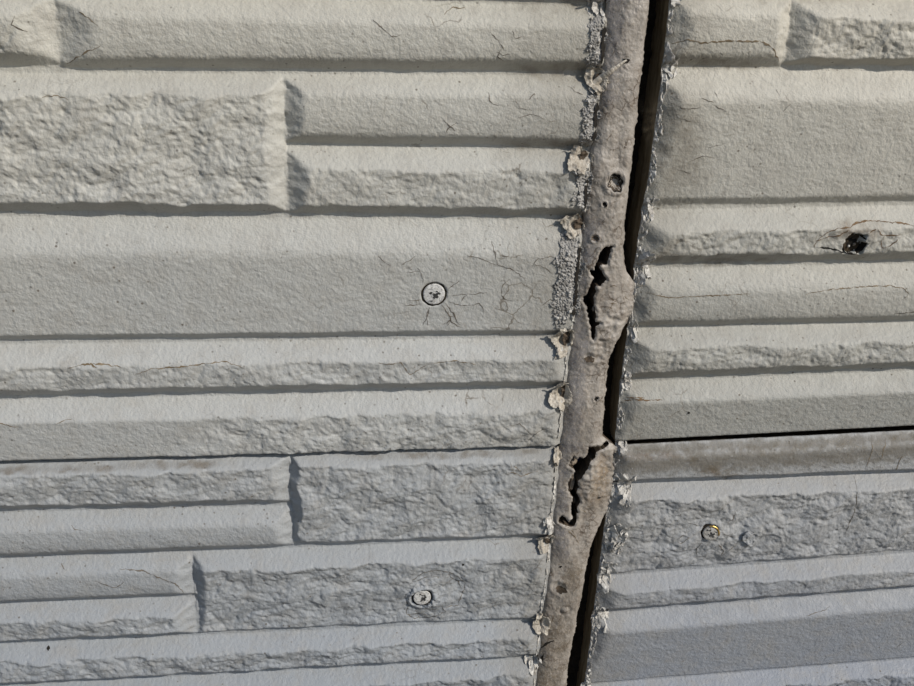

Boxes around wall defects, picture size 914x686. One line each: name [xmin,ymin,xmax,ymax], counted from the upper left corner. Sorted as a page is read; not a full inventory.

spalling [524,0,630,686]